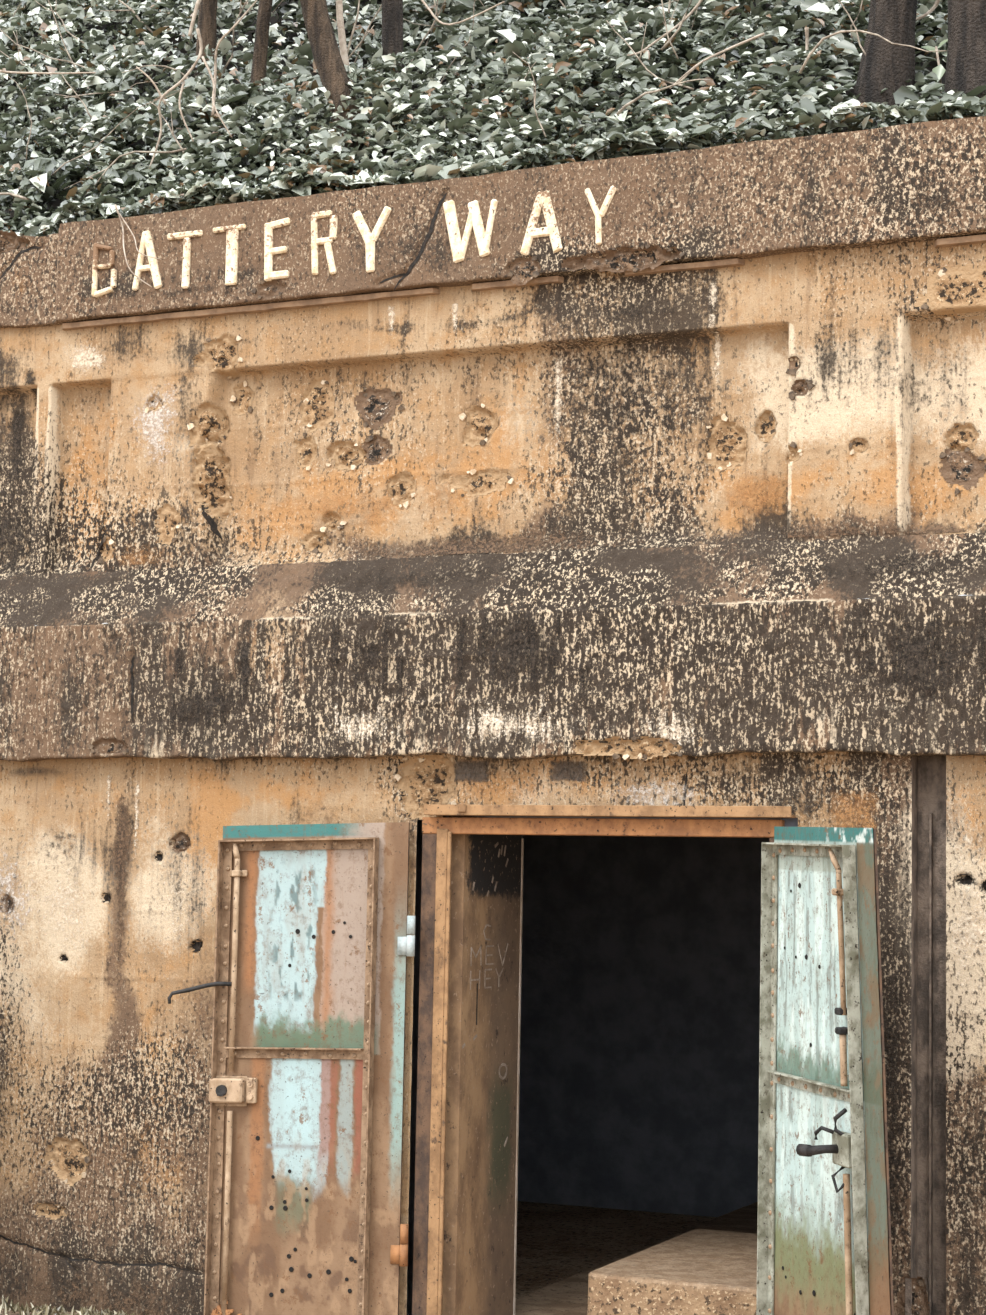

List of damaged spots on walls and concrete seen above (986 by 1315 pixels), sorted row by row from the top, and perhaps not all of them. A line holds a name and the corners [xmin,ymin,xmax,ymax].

spalling [561,244,685,273]
spalling [141,332,254,545]
spalling [294,377,405,471]
spalling [939,422,986,495]
damp [329,620,402,740]
damp [456,612,568,743]
damp [835,607,986,716]
damp [551,761,586,781]
spalling [573,736,683,761]
damp [646,712,694,744]
damp [107,780,140,953]
crack [0,1235,203,1275]